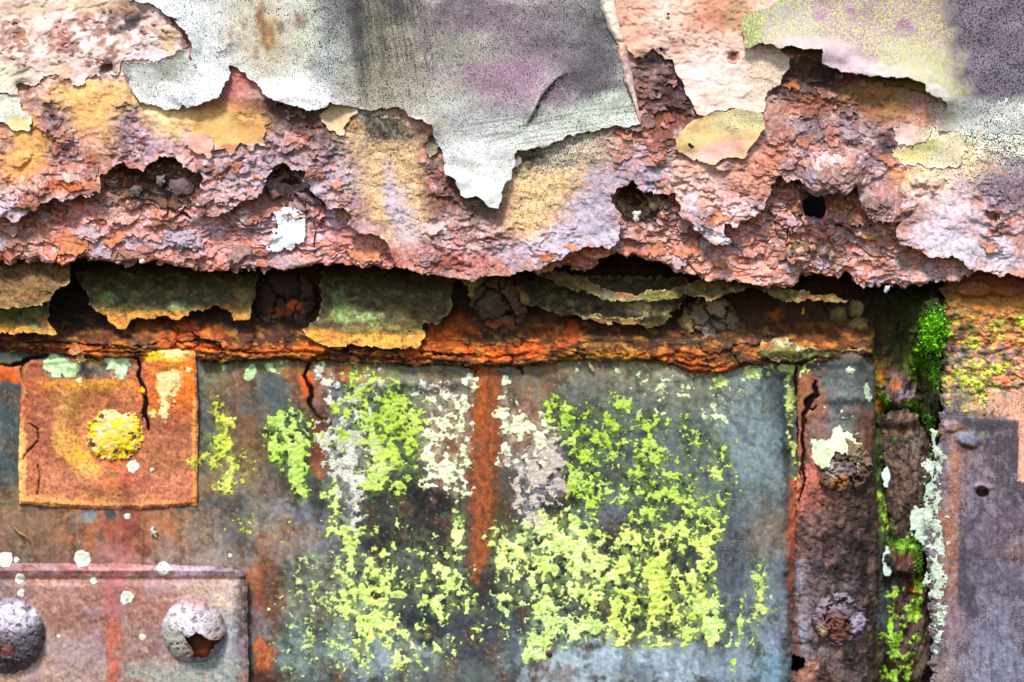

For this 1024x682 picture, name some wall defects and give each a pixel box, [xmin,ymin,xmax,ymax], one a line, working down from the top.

peeling [0,0,1024,226]
peeling [0,113,489,350]
peeling [508,180,870,329]
peeling [898,256,961,288]
peeling [980,228,1003,254]
crack [0,321,258,431]
crack [303,362,330,425]
rust [467,367,502,582]
crack [793,363,819,504]
rust [99,508,132,682]
rust [786,477,799,627]